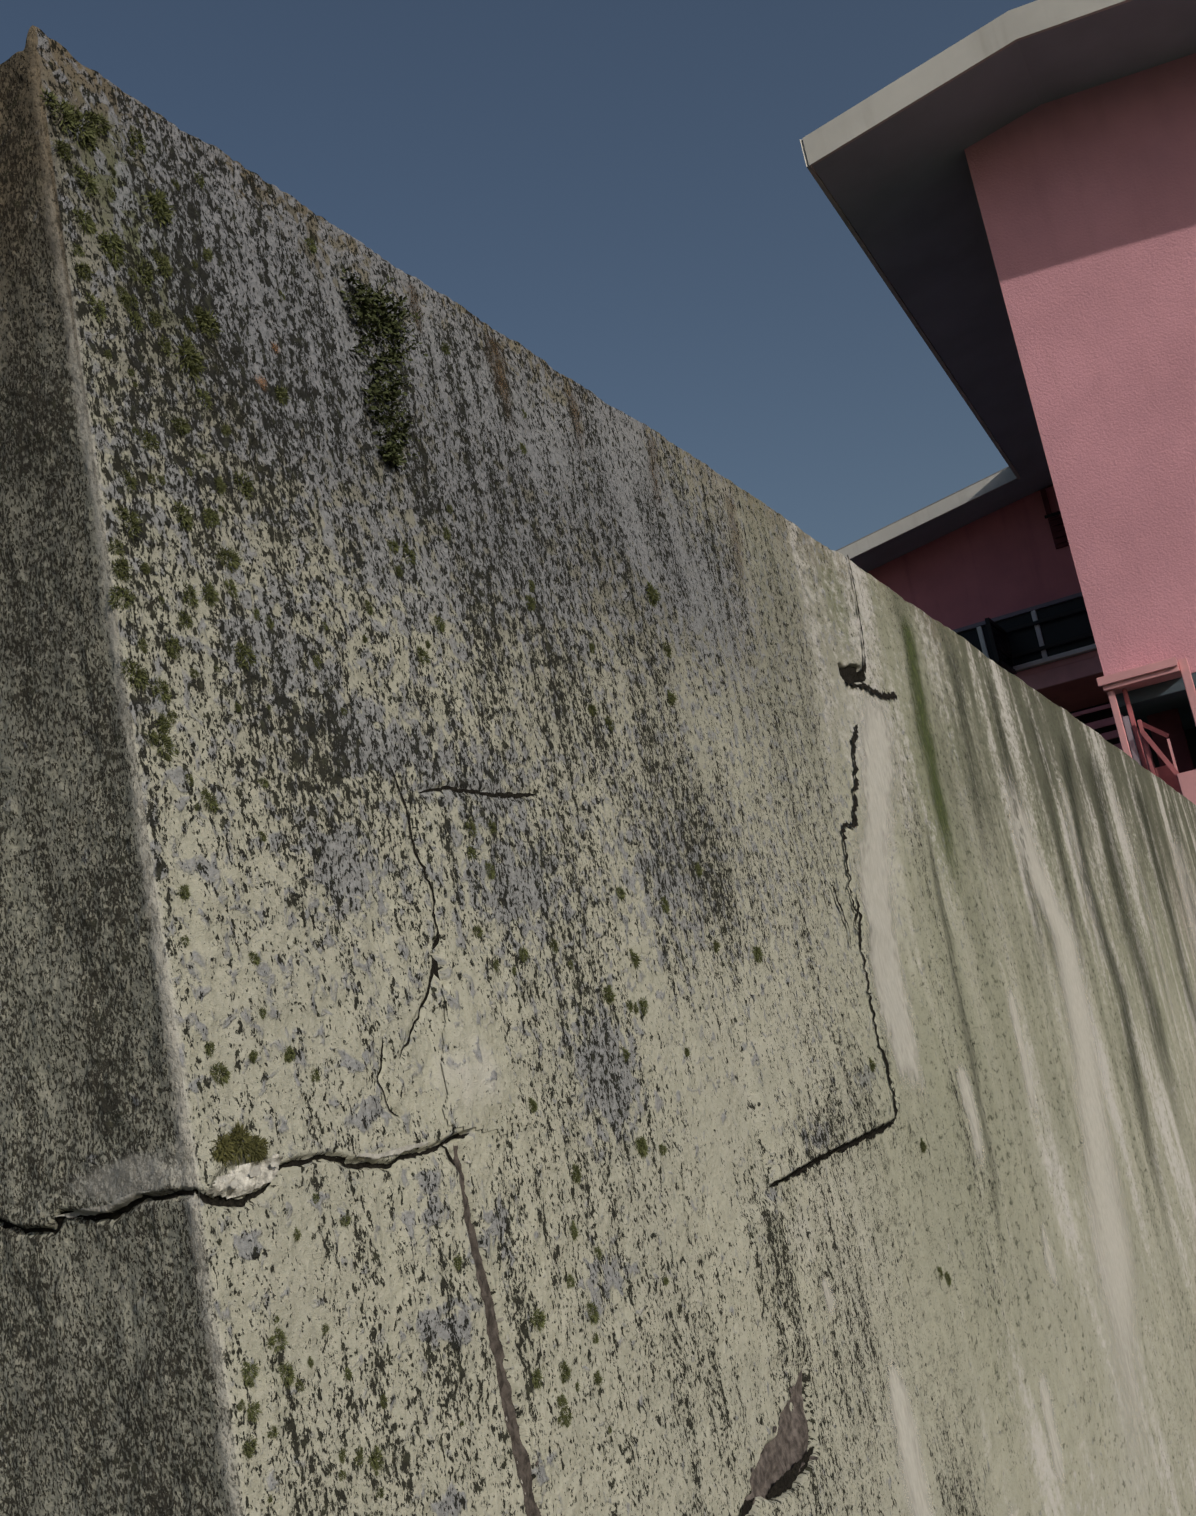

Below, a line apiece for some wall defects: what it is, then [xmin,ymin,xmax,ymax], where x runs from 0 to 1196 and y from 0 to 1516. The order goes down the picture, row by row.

damp [902,621,950,871]
crack [0,761,545,1516]
crack [769,555,898,1361]
damp [959,1043,982,1156]
damp [993,700,1151,1396]
damp [1091,765,1196,1059]
spalling [741,1370,818,1516]
damp [890,1370,930,1516]
damp [1040,1377,1063,1479]